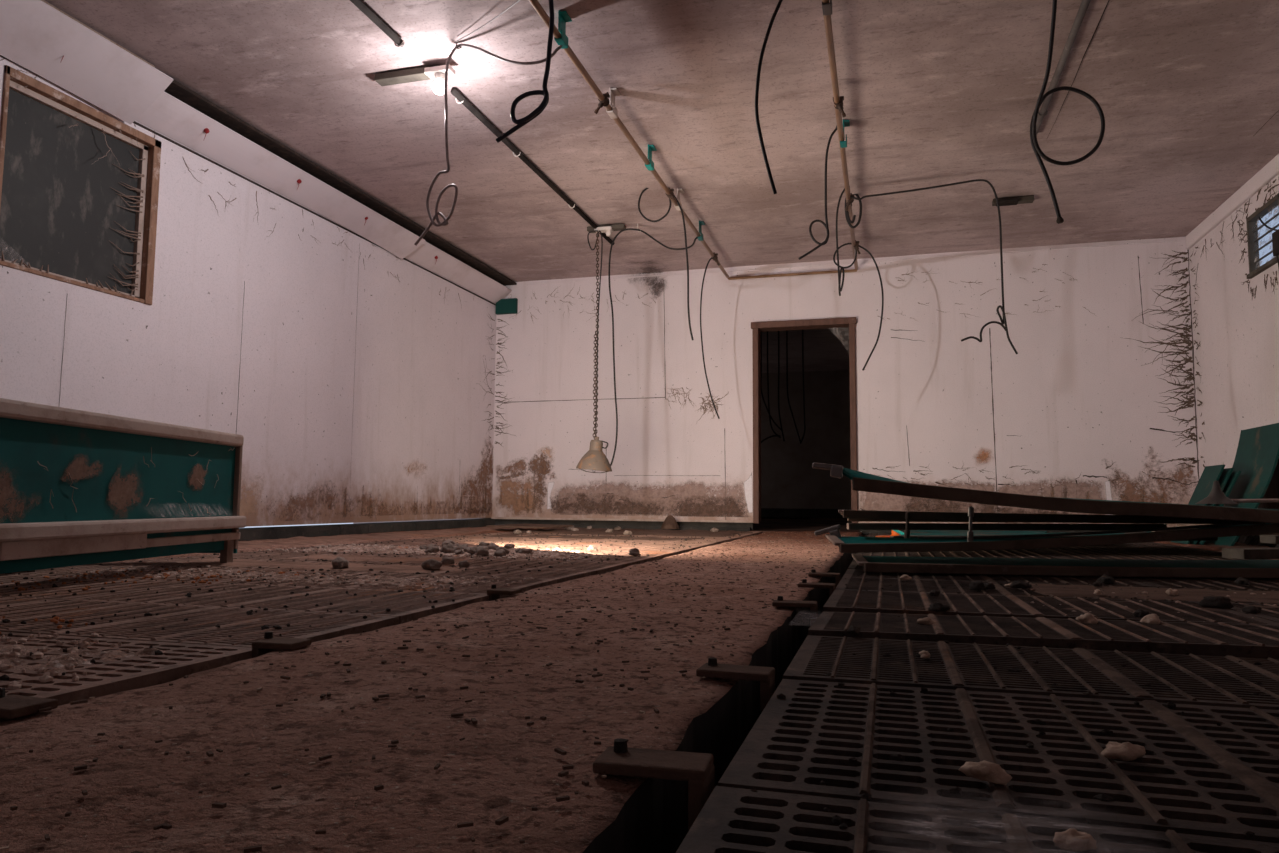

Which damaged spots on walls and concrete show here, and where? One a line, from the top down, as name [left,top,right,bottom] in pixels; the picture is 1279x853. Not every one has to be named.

water stain [239,442,493,521]
water stain [1108,452,1195,503]